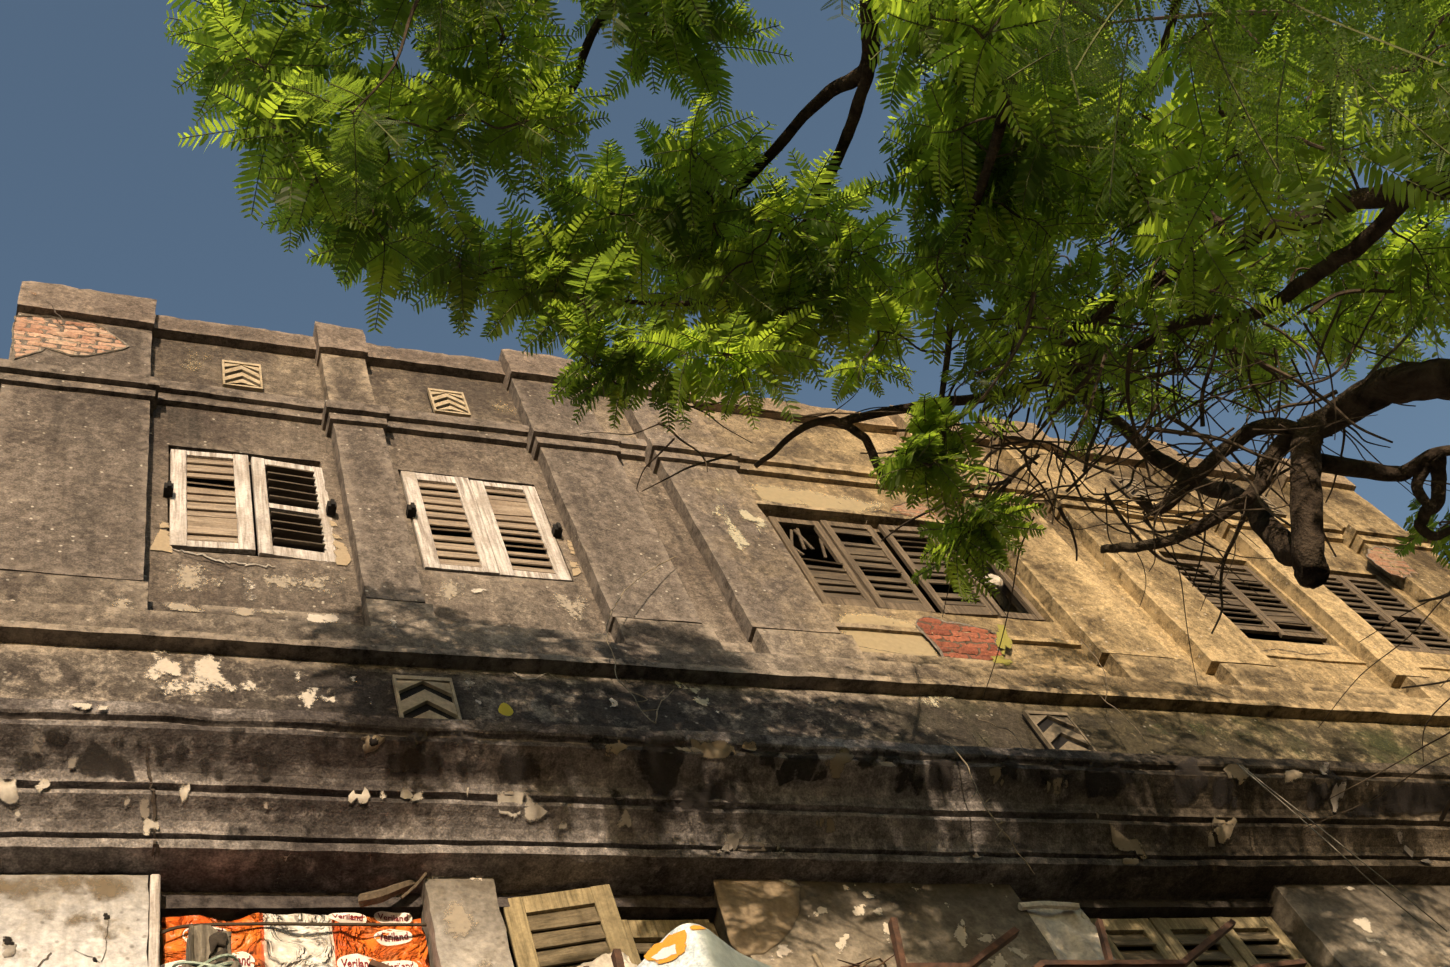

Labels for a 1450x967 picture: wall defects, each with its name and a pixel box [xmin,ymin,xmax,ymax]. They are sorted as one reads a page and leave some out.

spalling [0,730,141,817]
spalling [155,744,223,778]
spalling [1040,757,1147,865]
spalling [1173,756,1249,847]
spalling [1284,762,1450,817]
peeling [835,934,849,954]
peeling [843,884,890,943]
peeling [954,919,1030,967]